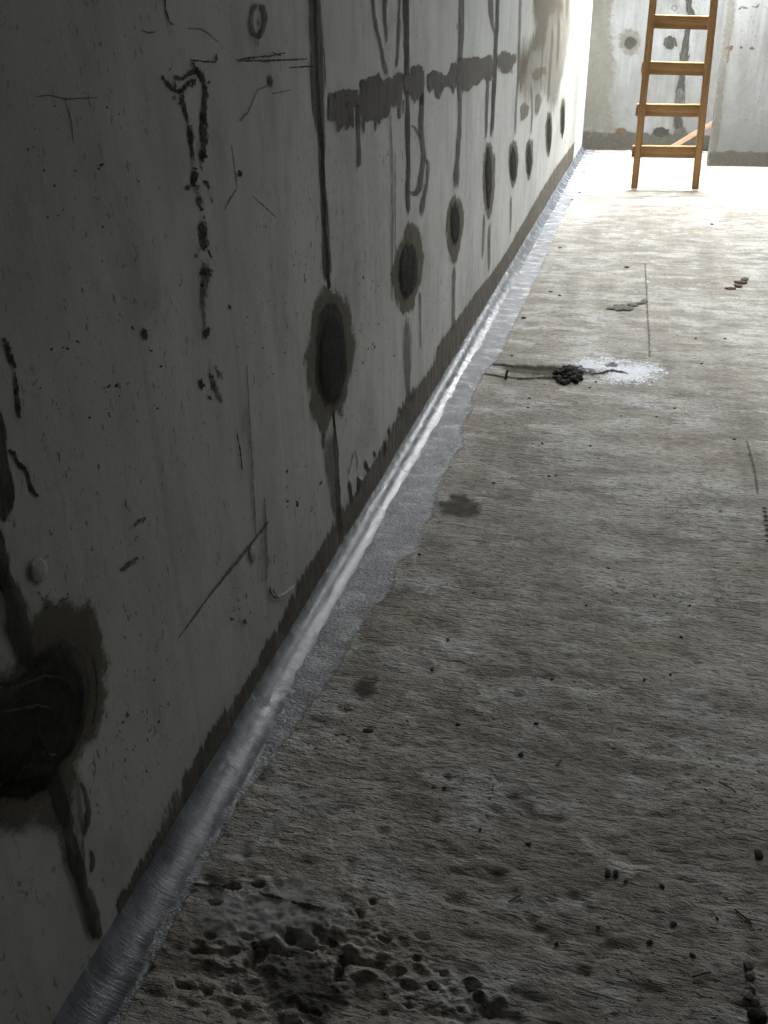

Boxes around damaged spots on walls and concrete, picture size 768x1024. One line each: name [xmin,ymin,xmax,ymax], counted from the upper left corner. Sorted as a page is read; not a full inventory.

crack [308,0,331,289]
leakage [2,337,21,418]
crack [322,408,342,531]
leakage [116,0,768,914]
leakage [0,413,108,832]
spalling [167,871,520,1024]